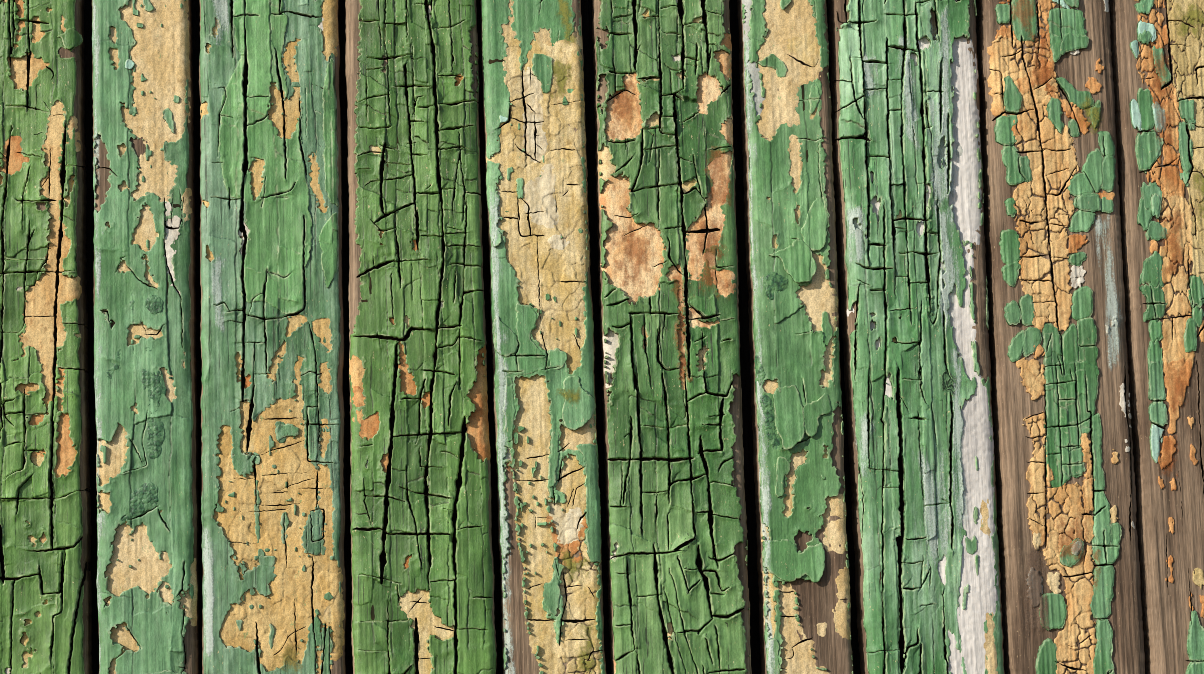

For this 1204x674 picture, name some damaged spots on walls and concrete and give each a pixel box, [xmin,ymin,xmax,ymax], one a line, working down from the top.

crack [0,0,113,674]
peeling [0,0,209,478]
crack [117,195,184,347]
crack [218,0,331,674]
peeling [214,314,345,674]
peeling [315,0,381,336]
crack [354,0,744,674]
peeling [466,0,736,674]
peeling [672,0,896,674]
crack [790,0,957,674]
peeling [938,0,1135,674]
crack [992,0,1165,578]